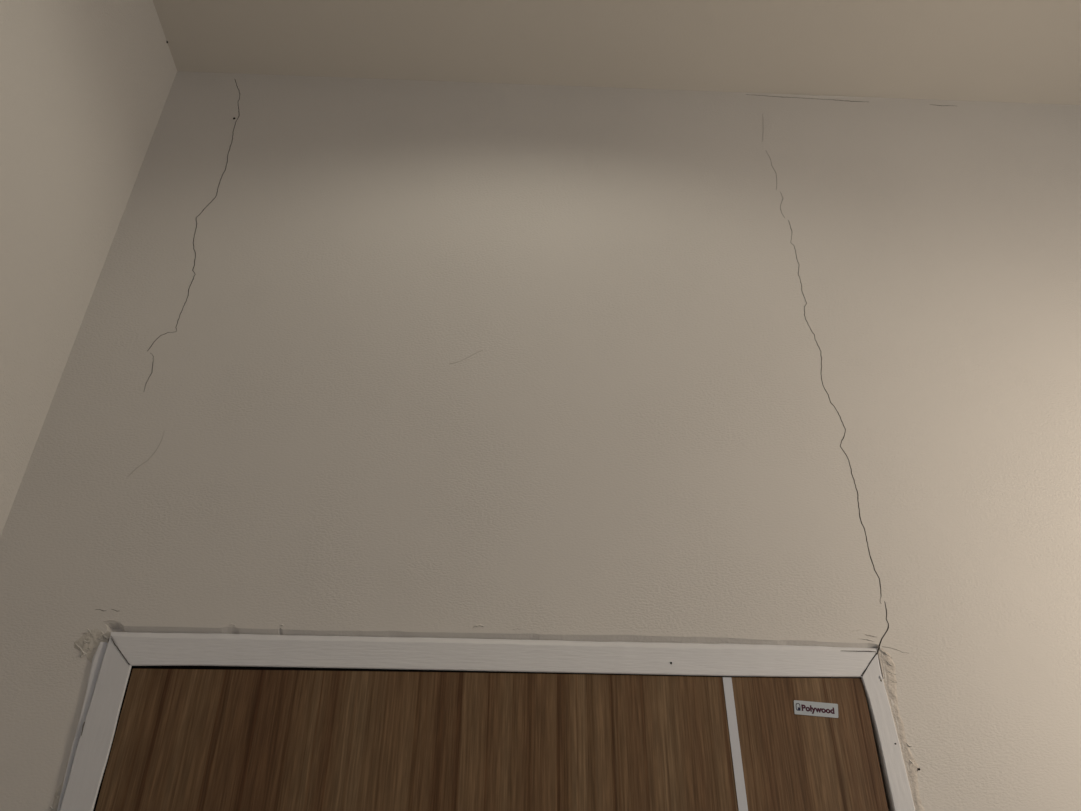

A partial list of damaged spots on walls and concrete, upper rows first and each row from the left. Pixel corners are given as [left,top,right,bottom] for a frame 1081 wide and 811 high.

crack [144,80,240,390]
crack [767,153,903,676]
spalling [851,629,925,811]